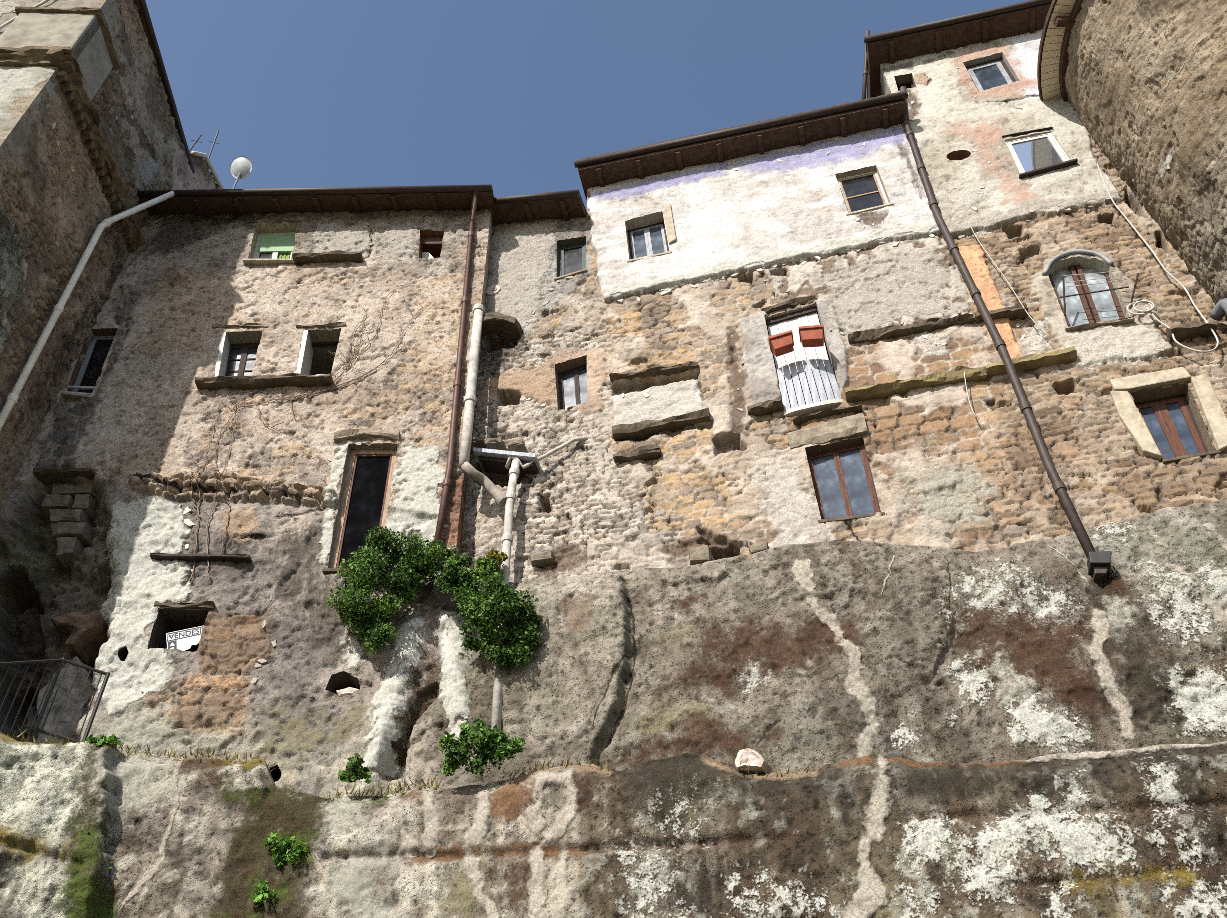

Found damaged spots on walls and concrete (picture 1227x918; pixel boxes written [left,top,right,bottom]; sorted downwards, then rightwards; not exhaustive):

flaking render [485,219,574,327]
flaking render [608,122,1122,357]
flaking render [483,363,556,408]
flaking render [610,379,701,425]
flaking render [725,328,748,436]
flaking render [1066,326,1166,371]
flaking render [91,495,195,714]
flaking render [251,619,276,684]
crack [588,597,637,747]
crack [755,719,781,747]